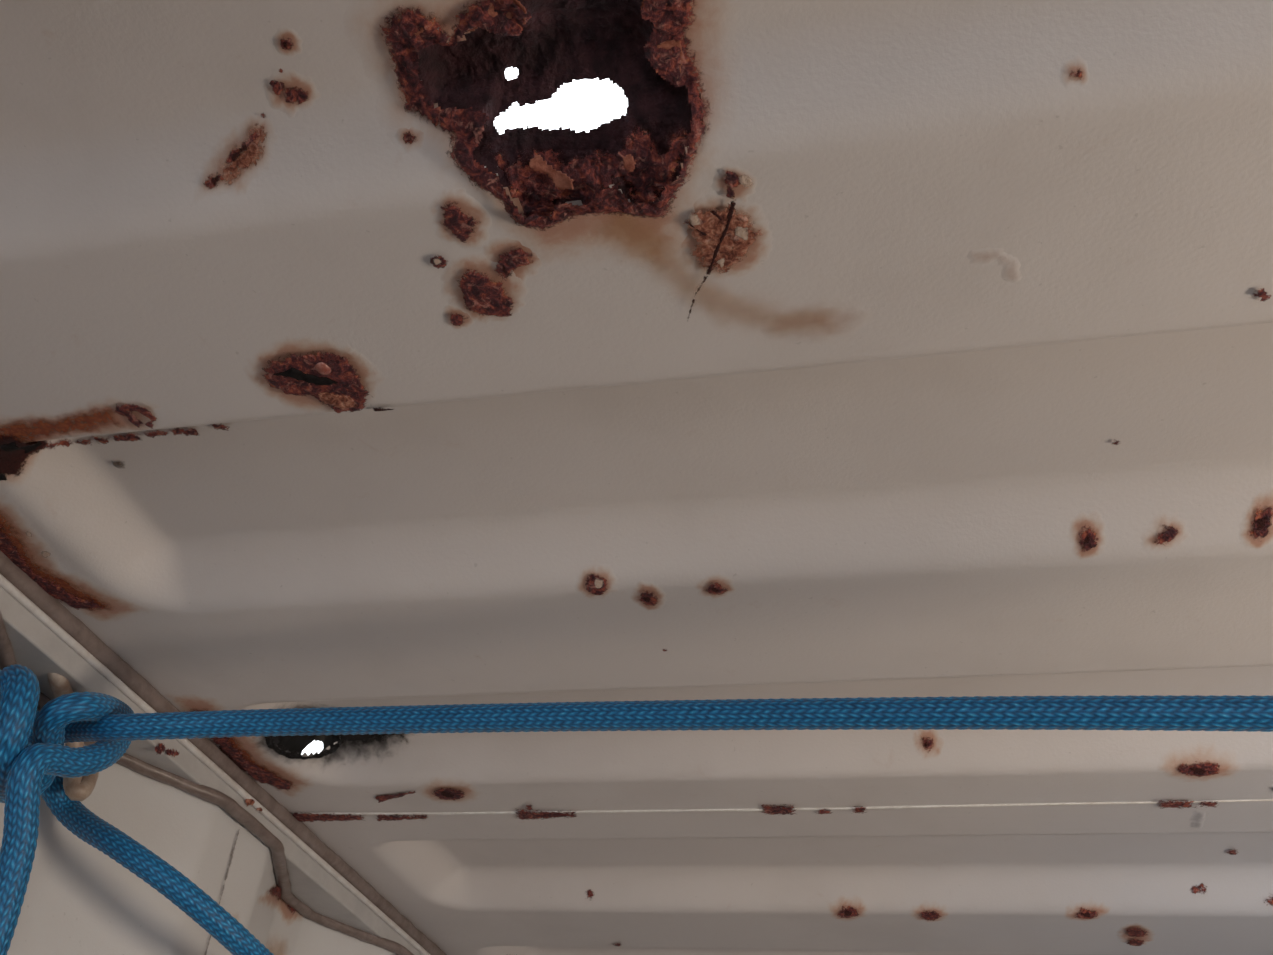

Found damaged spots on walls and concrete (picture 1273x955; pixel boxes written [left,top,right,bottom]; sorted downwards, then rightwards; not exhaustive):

corrosion [192,27,322,204]
corrosion [342,0,758,330]
corrosion [243,335,386,415]
corrosion [0,395,167,623]
corrosion [1067,510,1108,560]
corrosion [1140,510,1191,556]
corrosion [1239,487,1273,550]
corrosion [630,580,668,611]
corrosion [694,572,737,599]
corrosion [164,693,228,712]
corrosion [209,736,484,822]
corrosion [515,805,577,820]